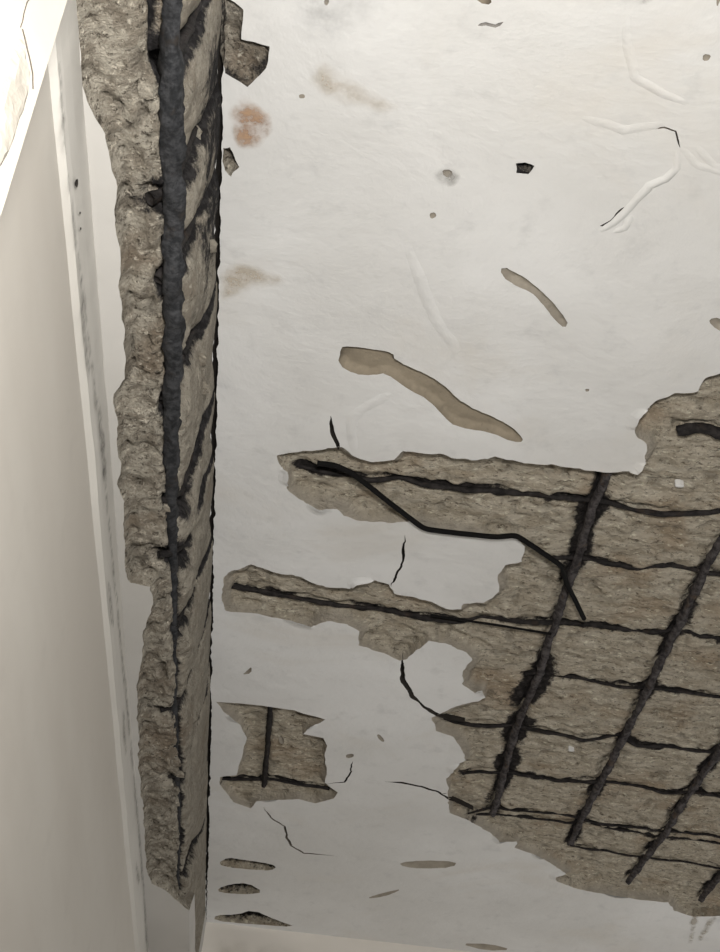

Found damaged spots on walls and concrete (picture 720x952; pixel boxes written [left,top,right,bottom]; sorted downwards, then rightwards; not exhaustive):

crack [20,0,34,89]
corrosion [237,108,264,145]
flaking render [338,346,523,442]
spalling [76,0,338,952]
crack [391,539,406,585]
spalling [218,374,720,917]
crack [264,808,338,857]